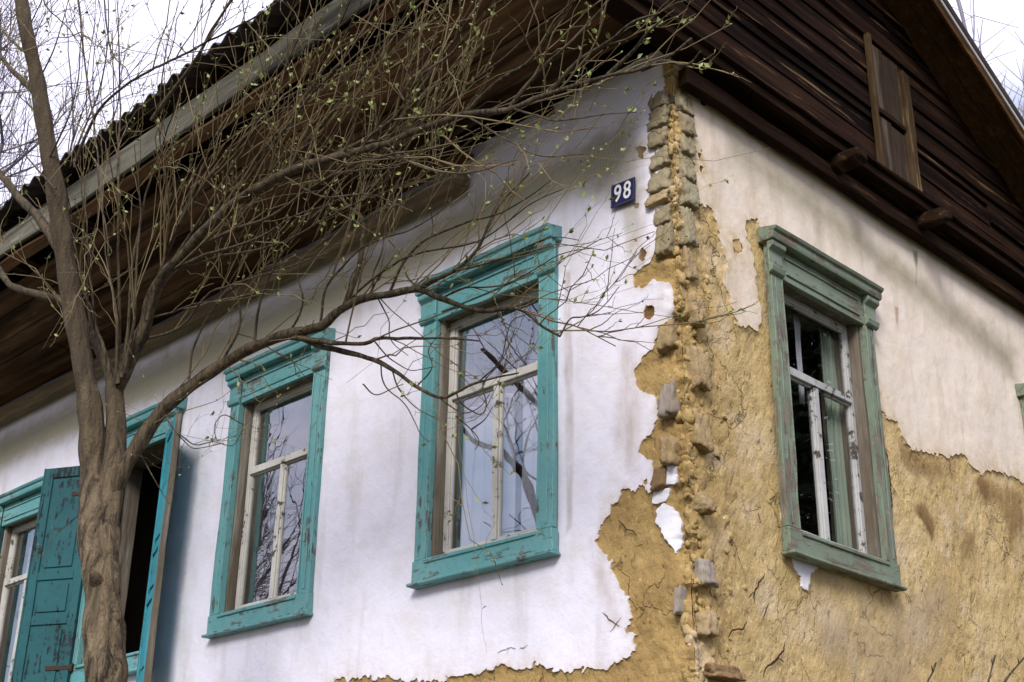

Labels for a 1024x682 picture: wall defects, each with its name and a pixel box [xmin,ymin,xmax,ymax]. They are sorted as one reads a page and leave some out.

flaking render [335,64,1024,682]
crack [884,436,923,529]
crack [728,535,769,639]
crack [763,643,785,678]